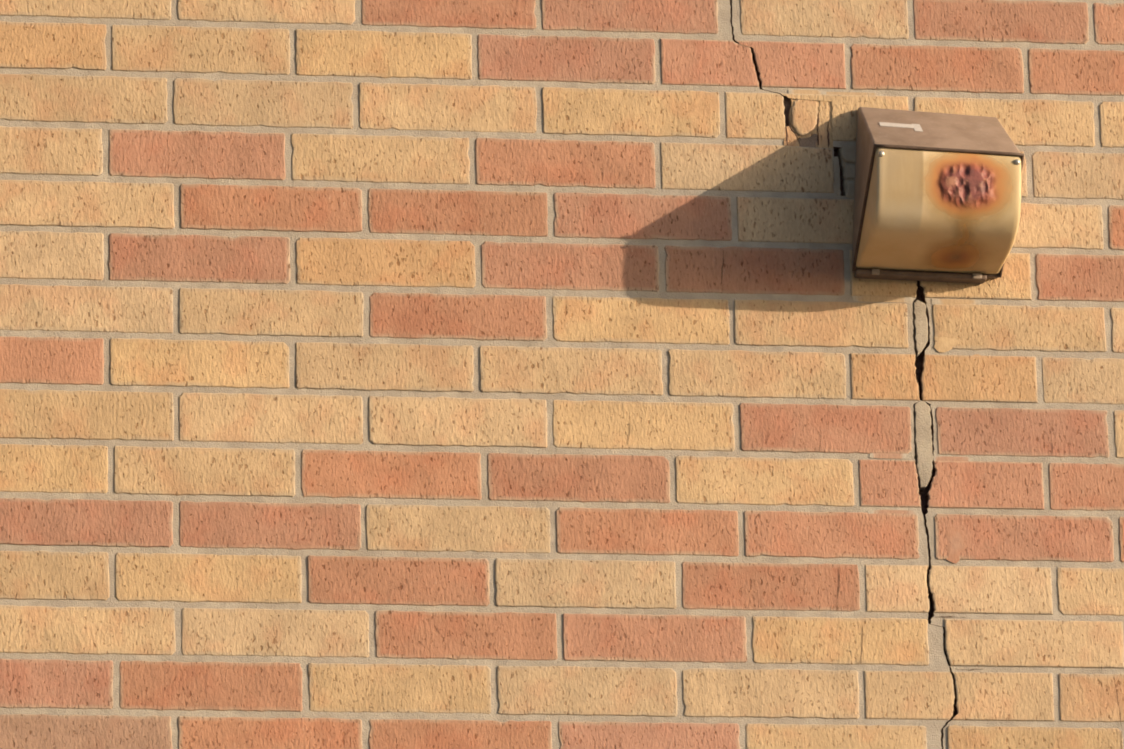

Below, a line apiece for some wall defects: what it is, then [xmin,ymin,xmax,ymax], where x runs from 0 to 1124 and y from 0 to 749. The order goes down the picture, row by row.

crack [730,0,856,198]
crack [913,281,983,749]